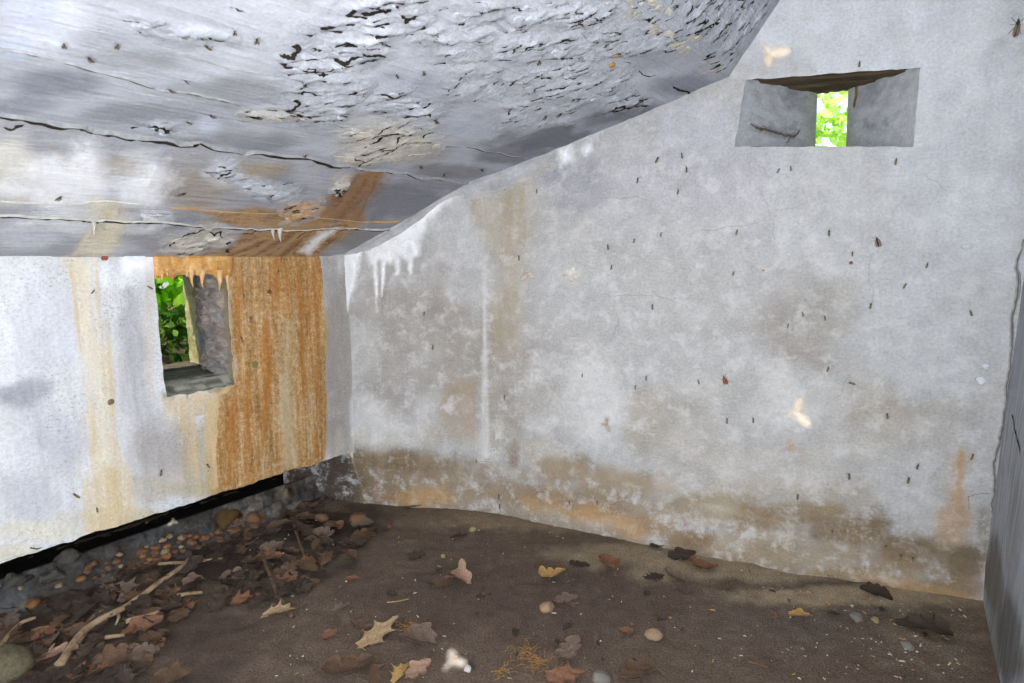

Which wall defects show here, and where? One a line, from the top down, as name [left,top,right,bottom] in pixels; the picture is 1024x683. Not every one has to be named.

crack [0,47,248,108]
crack [0,214,390,238]
crack [0,113,469,185]
spalling [82,0,780,227]
corrosion [145,166,402,504]
leakage [341,135,715,557]
leakage [723,431,990,601]